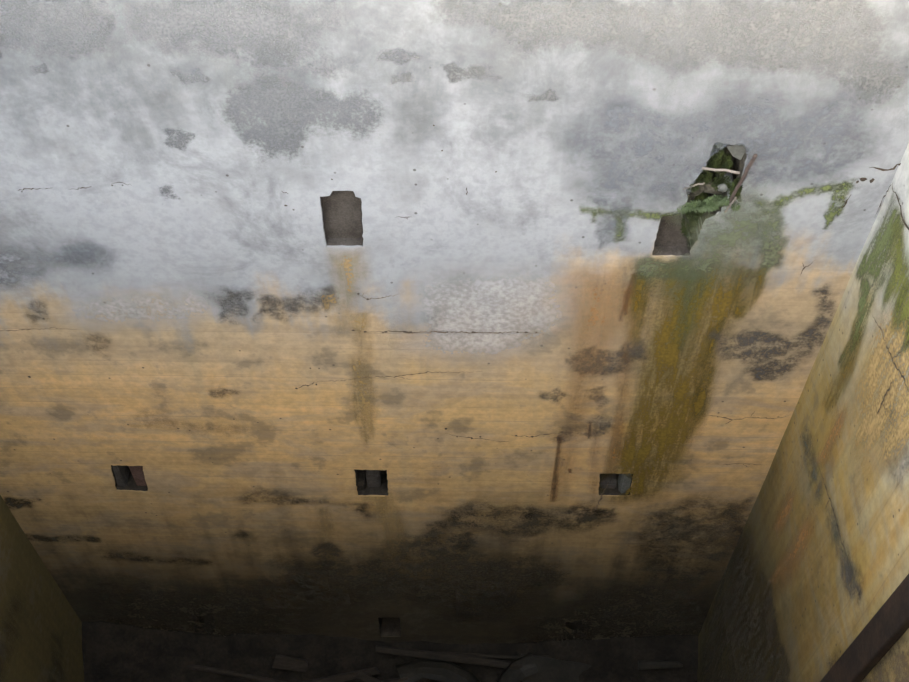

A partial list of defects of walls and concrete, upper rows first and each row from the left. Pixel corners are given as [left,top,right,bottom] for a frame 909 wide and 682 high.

spalling [677,142,758,251]
crack [842,163,909,230]
water stain [220,288,330,319]
crack [295,368,481,389]
crack [351,329,551,337]
water stain [566,345,645,375]
water stain [710,287,833,380]
crack [873,317,909,415]
water stain [90,503,611,637]